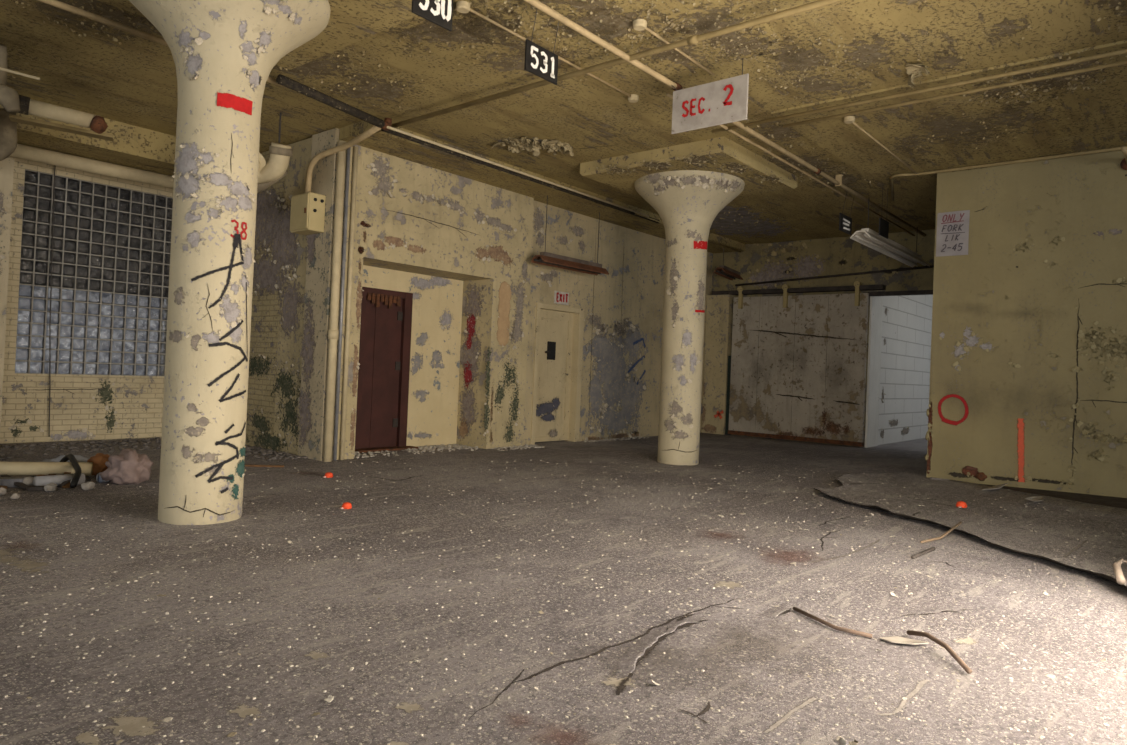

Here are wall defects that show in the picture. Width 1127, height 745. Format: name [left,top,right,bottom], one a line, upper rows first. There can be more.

peeling [11,0,211,81]
peeling [168,142,317,500]
peeling [372,236,426,254]
peeling [367,152,517,233]
flaking render [407,244,560,444]
peeling [596,119,881,440]
crack [1067,283,1127,485]
crack [468,596,791,723]